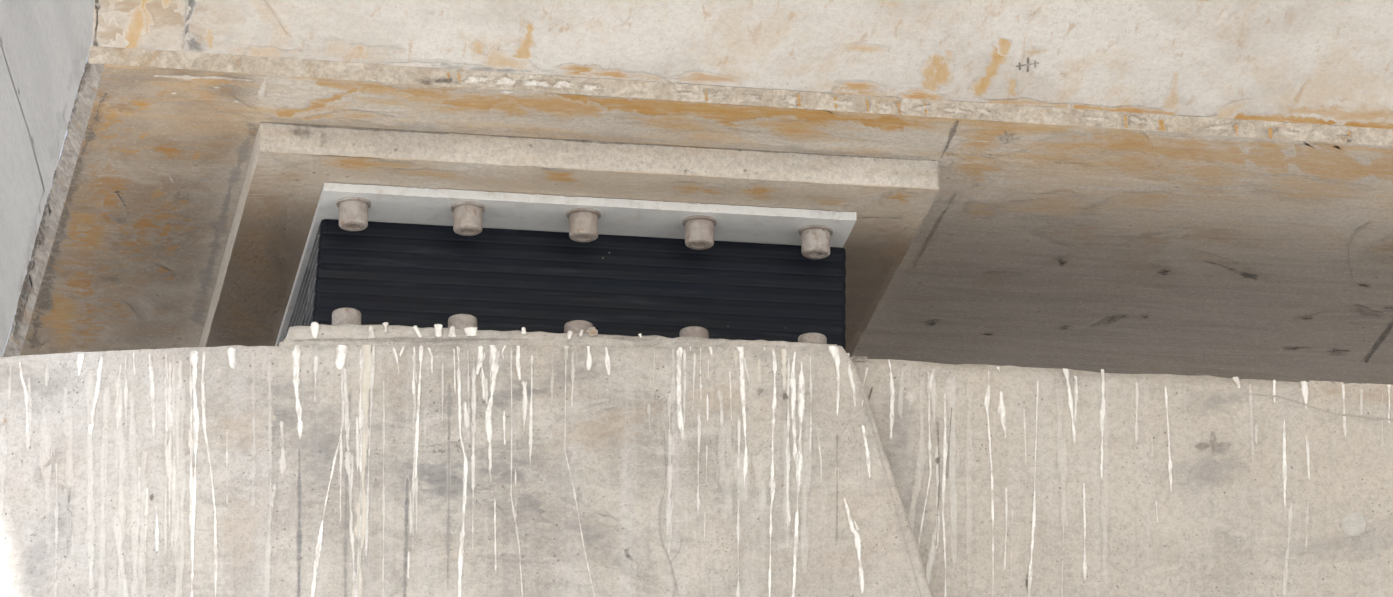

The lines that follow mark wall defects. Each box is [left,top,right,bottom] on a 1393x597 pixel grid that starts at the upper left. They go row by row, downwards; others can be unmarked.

rust [92,0,307,59]
rust [31,22,1393,354]
leakage [0,63,864,597]
leakage [828,346,1039,597]
leakage [1055,368,1110,597]
leakage [1134,377,1393,597]